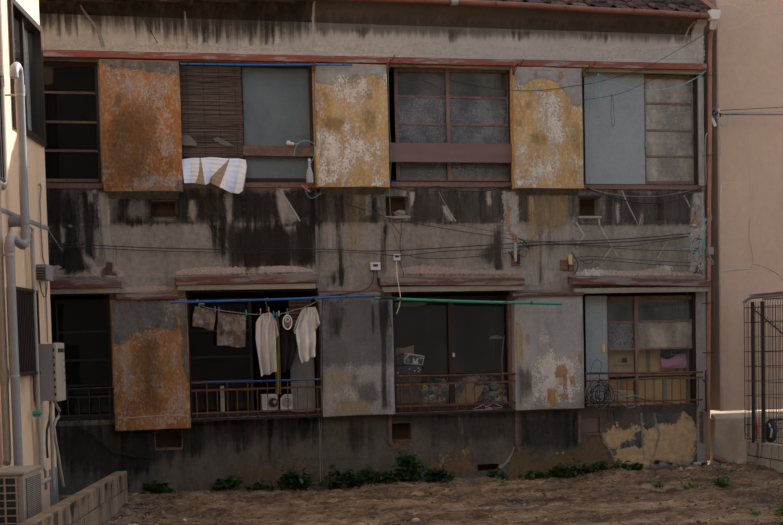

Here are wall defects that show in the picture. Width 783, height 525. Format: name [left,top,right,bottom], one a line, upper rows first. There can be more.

leakage [100,59,179,74]
leakage [315,63,386,85]
leakage [39,0,699,61]
leakage [514,67,582,106]
peeling [316,71,388,186]
peeling [501,82,582,278]
leakage [391,188,576,286]
leakage [46,188,379,380]
leakage [323,299,393,408]
peeling [521,328,584,409]
peeling [508,411,697,478]